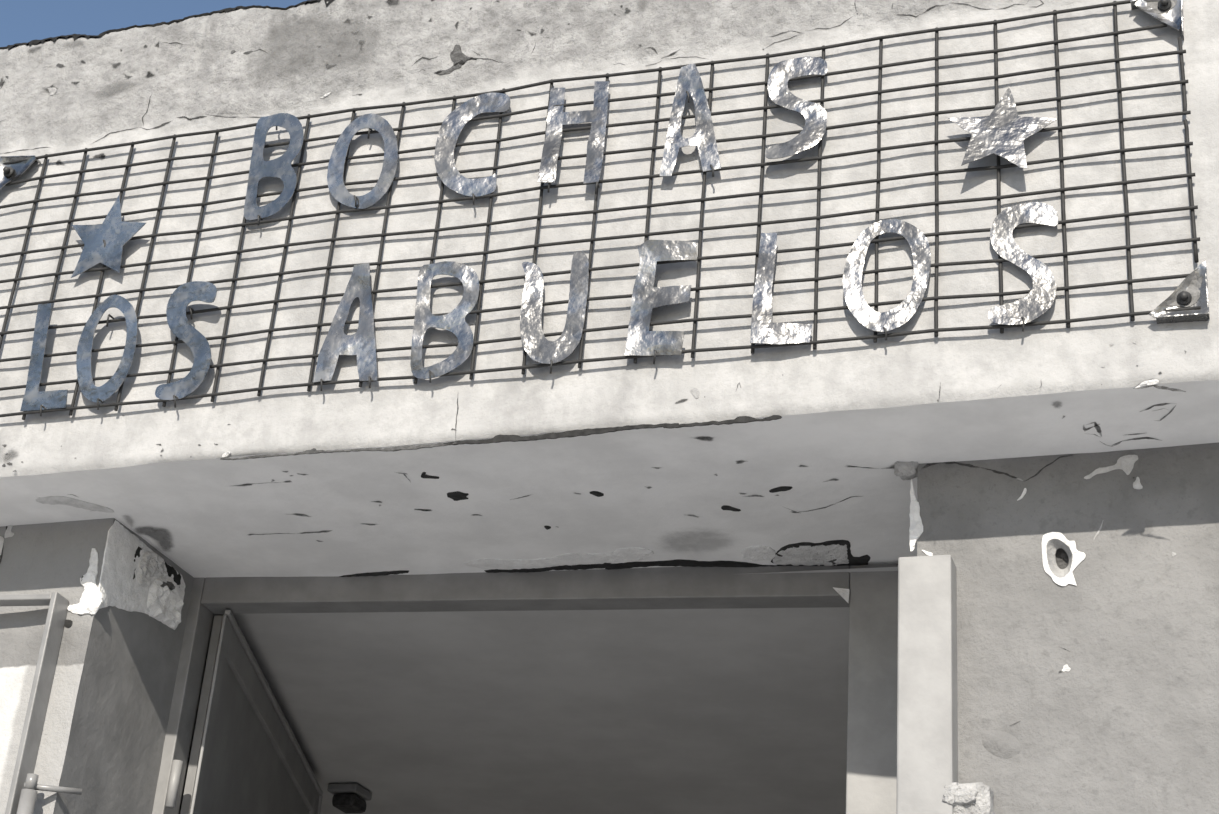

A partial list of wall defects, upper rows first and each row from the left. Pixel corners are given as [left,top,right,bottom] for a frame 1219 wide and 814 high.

spalling [435,44,477,75]
crack [923,403,1175,481]
peeling [1084,455,1143,489]
peeling [447,491,469,501]
peeling [721,486,793,512]
peeling [909,479,933,556]
peeling [36,494,186,630]
crack [339,569,409,577]
peeling [463,547,654,570]
crack [484,559,778,573]
spalling [741,540,870,566]
spalling [1042,532,1086,586]